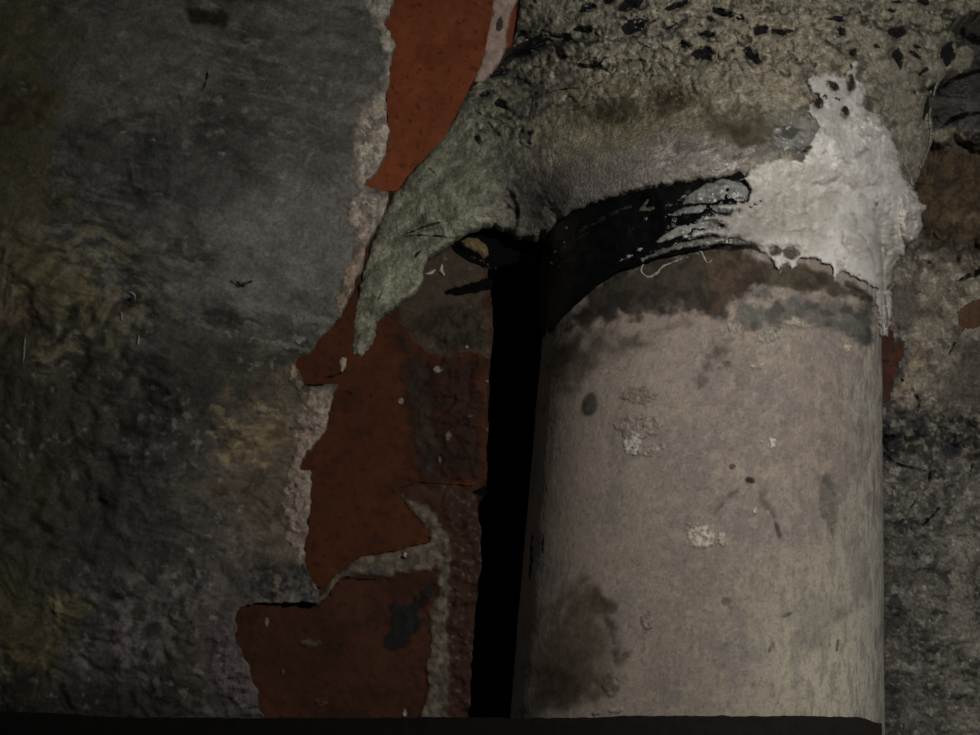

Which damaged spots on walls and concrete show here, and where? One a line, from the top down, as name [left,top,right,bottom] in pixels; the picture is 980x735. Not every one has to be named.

flaking render [212,0,494,718]
water stain [558,61,926,389]